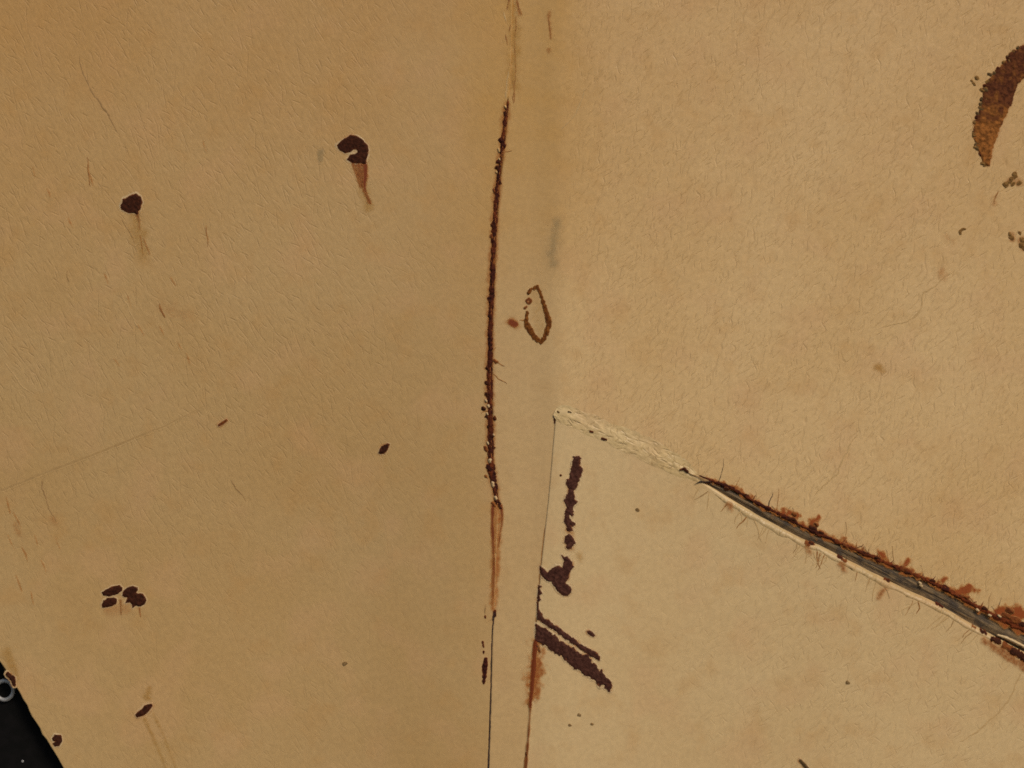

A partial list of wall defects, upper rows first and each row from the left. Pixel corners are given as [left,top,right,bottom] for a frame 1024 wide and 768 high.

corrosion [970,45,1024,167]
corrosion [486,100,509,610]
corrosion [508,285,552,345]
corrosion [679,457,1024,671]
corrosion [524,639,545,768]